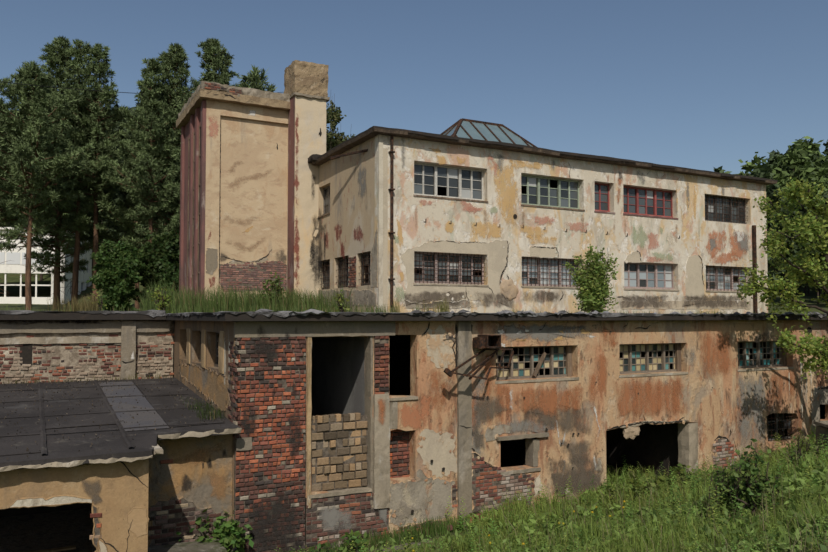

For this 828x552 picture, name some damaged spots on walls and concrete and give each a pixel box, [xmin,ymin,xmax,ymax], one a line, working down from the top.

crack [219,197,270,264]
flaking render [205,248,287,292]
water stain [310,213,344,280]
peeling [621,230,751,310]
peeling [424,325,457,371]
corrosion [590,355,607,398]
corrosion [618,381,683,415]
corrosion [703,333,730,372]
peeling [389,428,458,534]
flaking render [472,451,539,514]
flaking render [712,438,738,470]
flaking render [9,495,109,552]